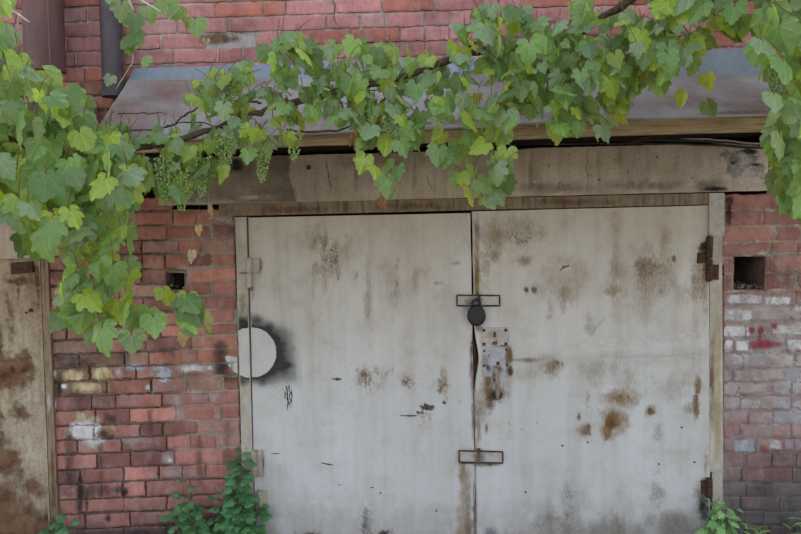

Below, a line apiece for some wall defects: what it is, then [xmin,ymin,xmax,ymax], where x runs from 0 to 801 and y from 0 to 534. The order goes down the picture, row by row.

damp [53,367,112,392]
damp [182,364,216,372]
rust [472,336,512,436]
damp [68,412,115,448]
rust [603,391,633,439]
rust [457,484,476,534]